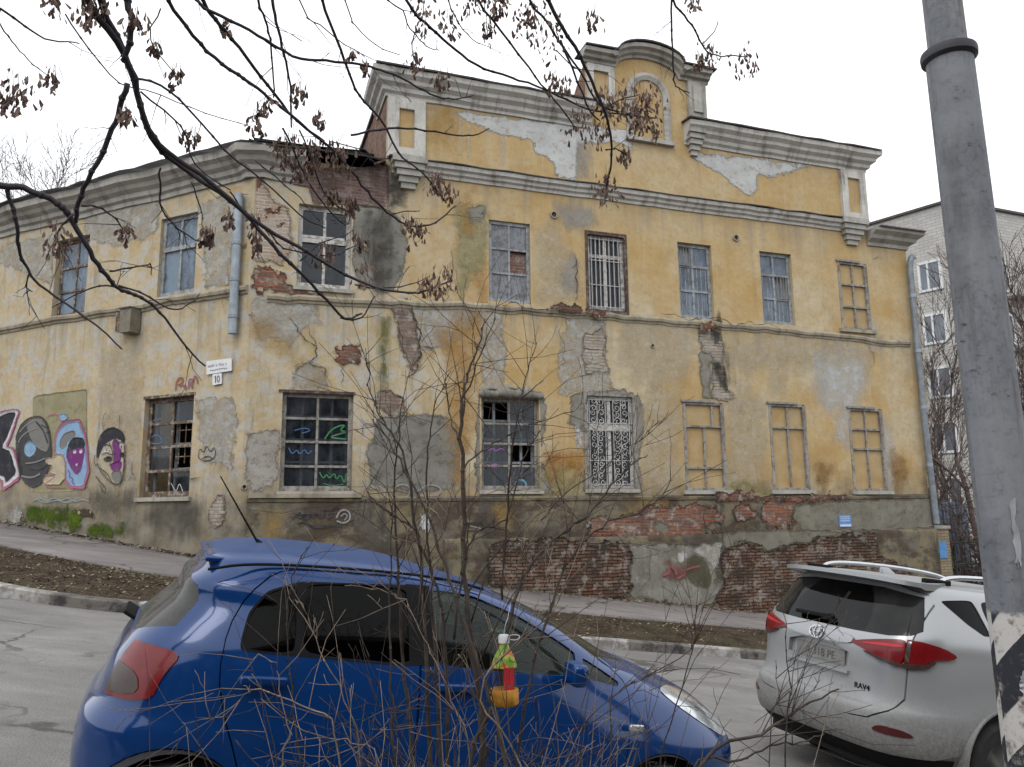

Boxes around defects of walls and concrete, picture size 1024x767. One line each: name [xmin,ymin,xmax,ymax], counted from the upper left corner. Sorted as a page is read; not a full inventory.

peeling [455,110,634,180]
peeling [691,152,809,196]
flaking render [243,177,322,346]
crack [289,317,344,388]
flaking render [333,343,362,365]
peeling [391,298,507,388]
peeling [546,302,613,396]
flaking render [697,321,735,403]
peeling [194,397,282,493]
flaking render [207,494,226,528]
flaking render [487,489,911,614]